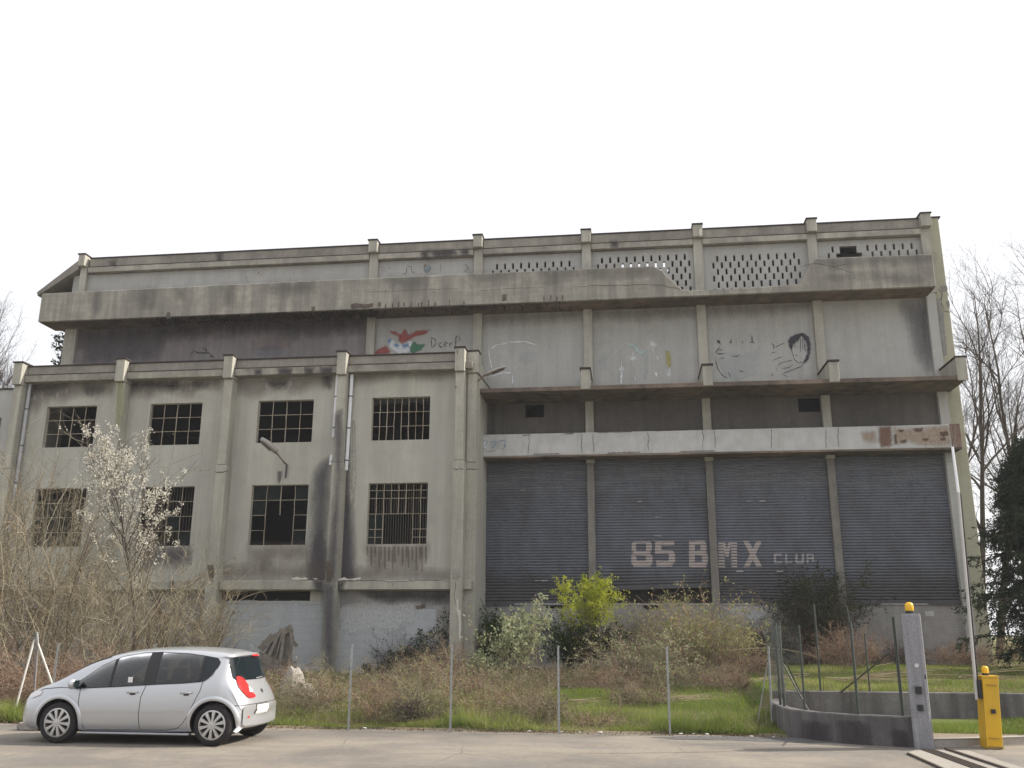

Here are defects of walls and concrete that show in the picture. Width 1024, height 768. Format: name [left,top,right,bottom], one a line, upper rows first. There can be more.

leakage [909,305,930,356]
leakage [311,414,356,669]